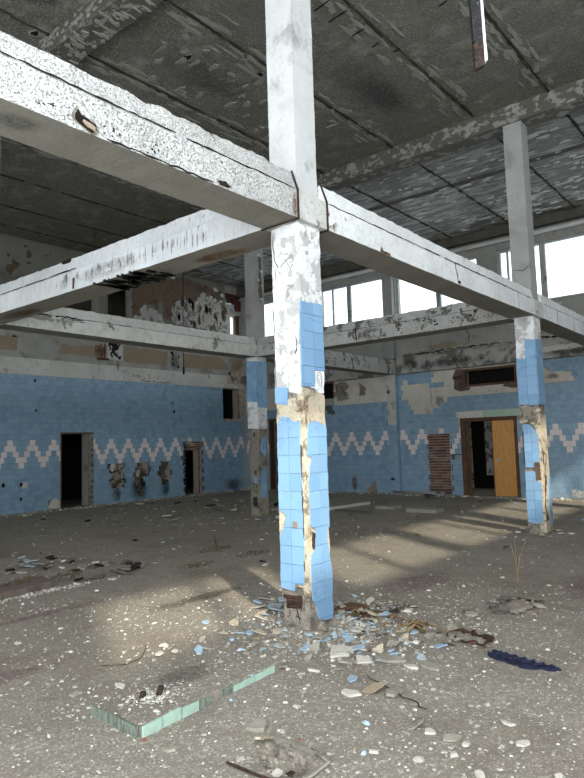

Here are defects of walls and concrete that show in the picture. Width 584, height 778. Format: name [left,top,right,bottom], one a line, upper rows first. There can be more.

peeling [35,0,269,150]
peeling [314,0,479,136]
crack [0,51,296,189]
peeling [314,93,434,158]
peeling [529,139,584,214]
flaking render [131,277,231,333]
flaking render [274,230,320,337]
peeling [326,365,476,425]
spalling [135,461,169,497]
spalling [534,453,544,481]
spalling [279,510,298,532]
spalling [282,592,305,610]